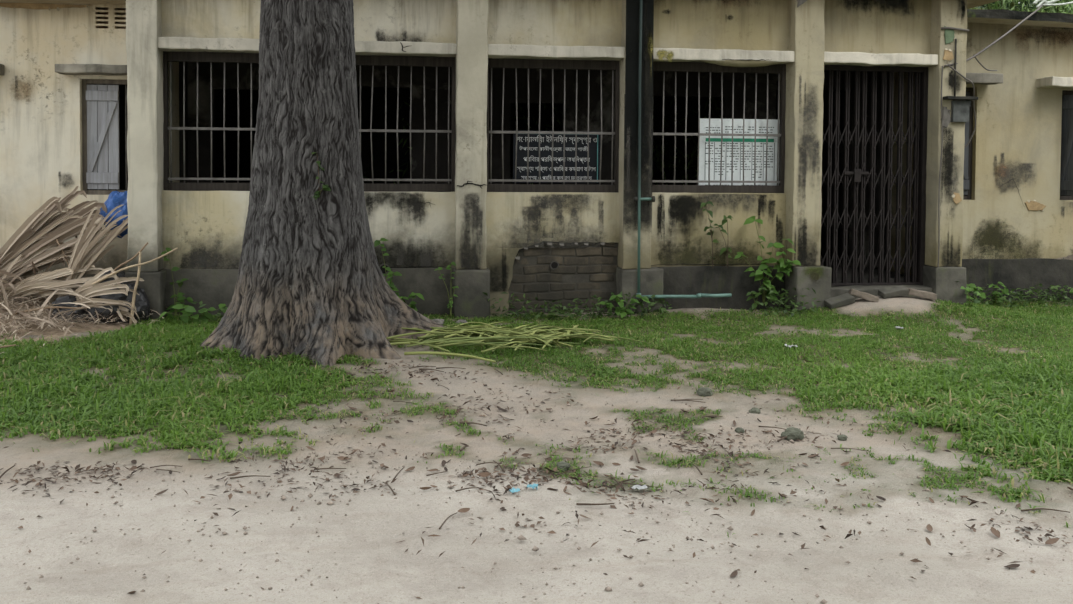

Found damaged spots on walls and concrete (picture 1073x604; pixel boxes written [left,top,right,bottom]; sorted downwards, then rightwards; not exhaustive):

water stain [623,0,819,280]
water stain [365,192,425,217]
water stain [375,243,444,268]
water stain [460,194,603,292]
water stain [975,221,1021,250]